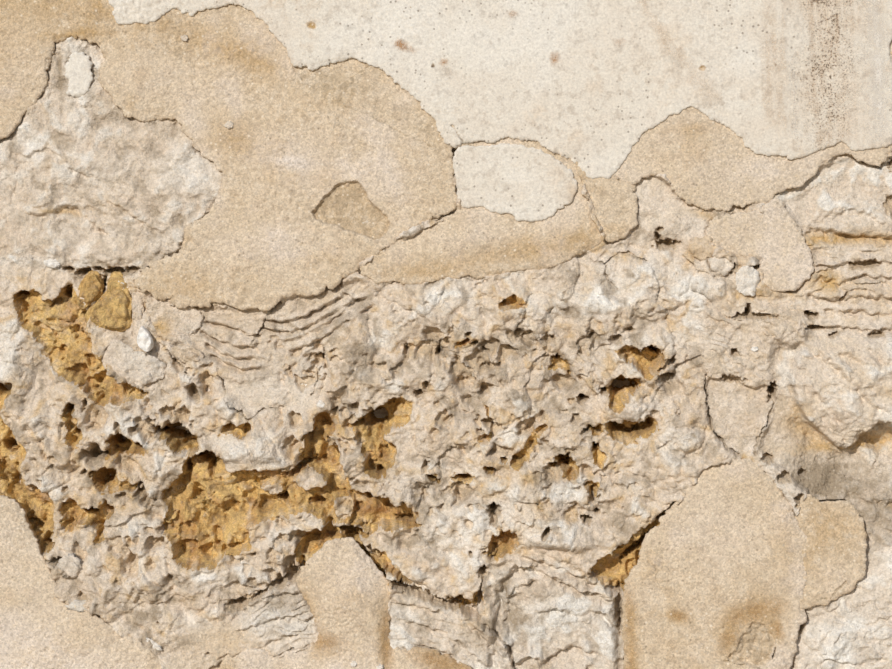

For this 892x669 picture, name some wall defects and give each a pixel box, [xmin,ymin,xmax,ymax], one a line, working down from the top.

peeling [0,0,578,311]
peeling [612,107,892,250]
spalling [0,137,892,669]
crack [704,374,776,459]
crack [472,567,516,669]